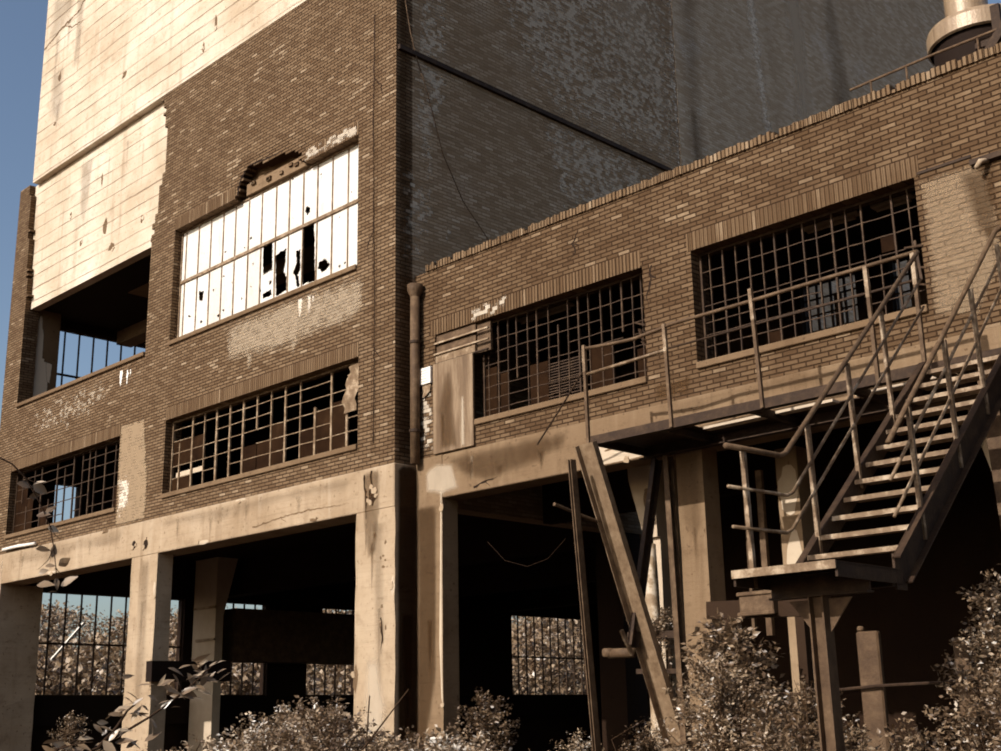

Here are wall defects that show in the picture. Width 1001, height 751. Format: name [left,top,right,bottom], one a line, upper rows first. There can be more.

crack [367,14,382,443]
crack [252,471,373,528]
leakage [368,666,380,736]